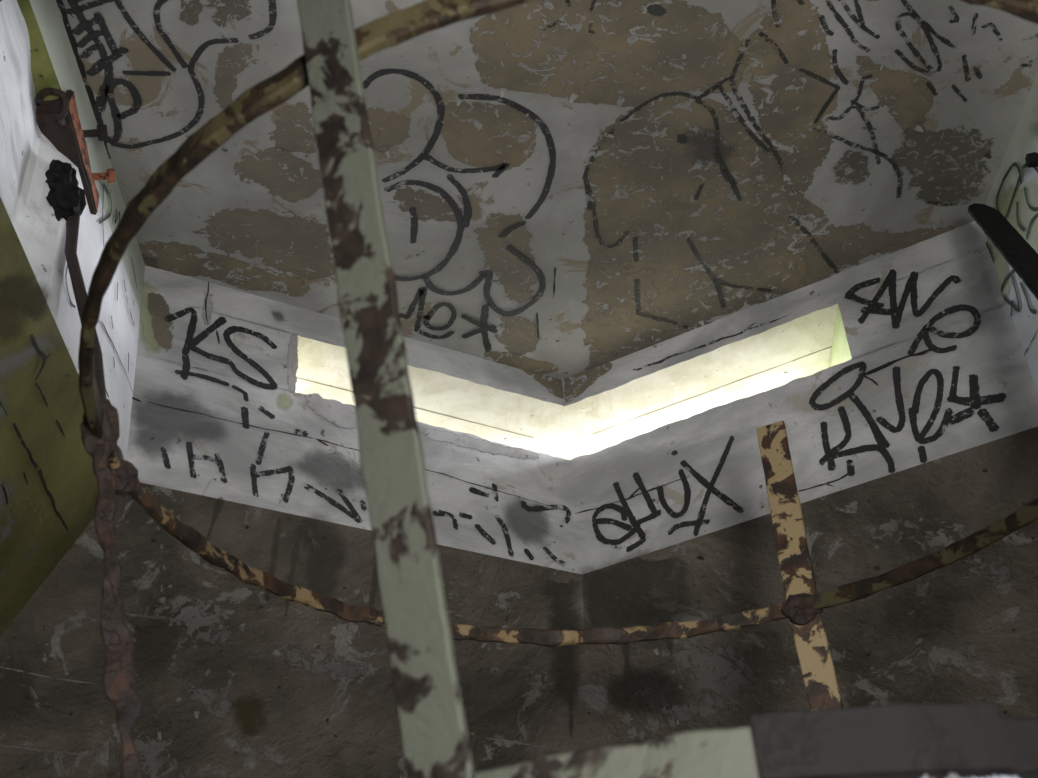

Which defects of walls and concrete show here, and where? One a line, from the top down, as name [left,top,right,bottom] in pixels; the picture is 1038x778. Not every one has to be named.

peeling [367,106,411,158]
peeling [138,102,336,298]
peeling [393,186,464,223]